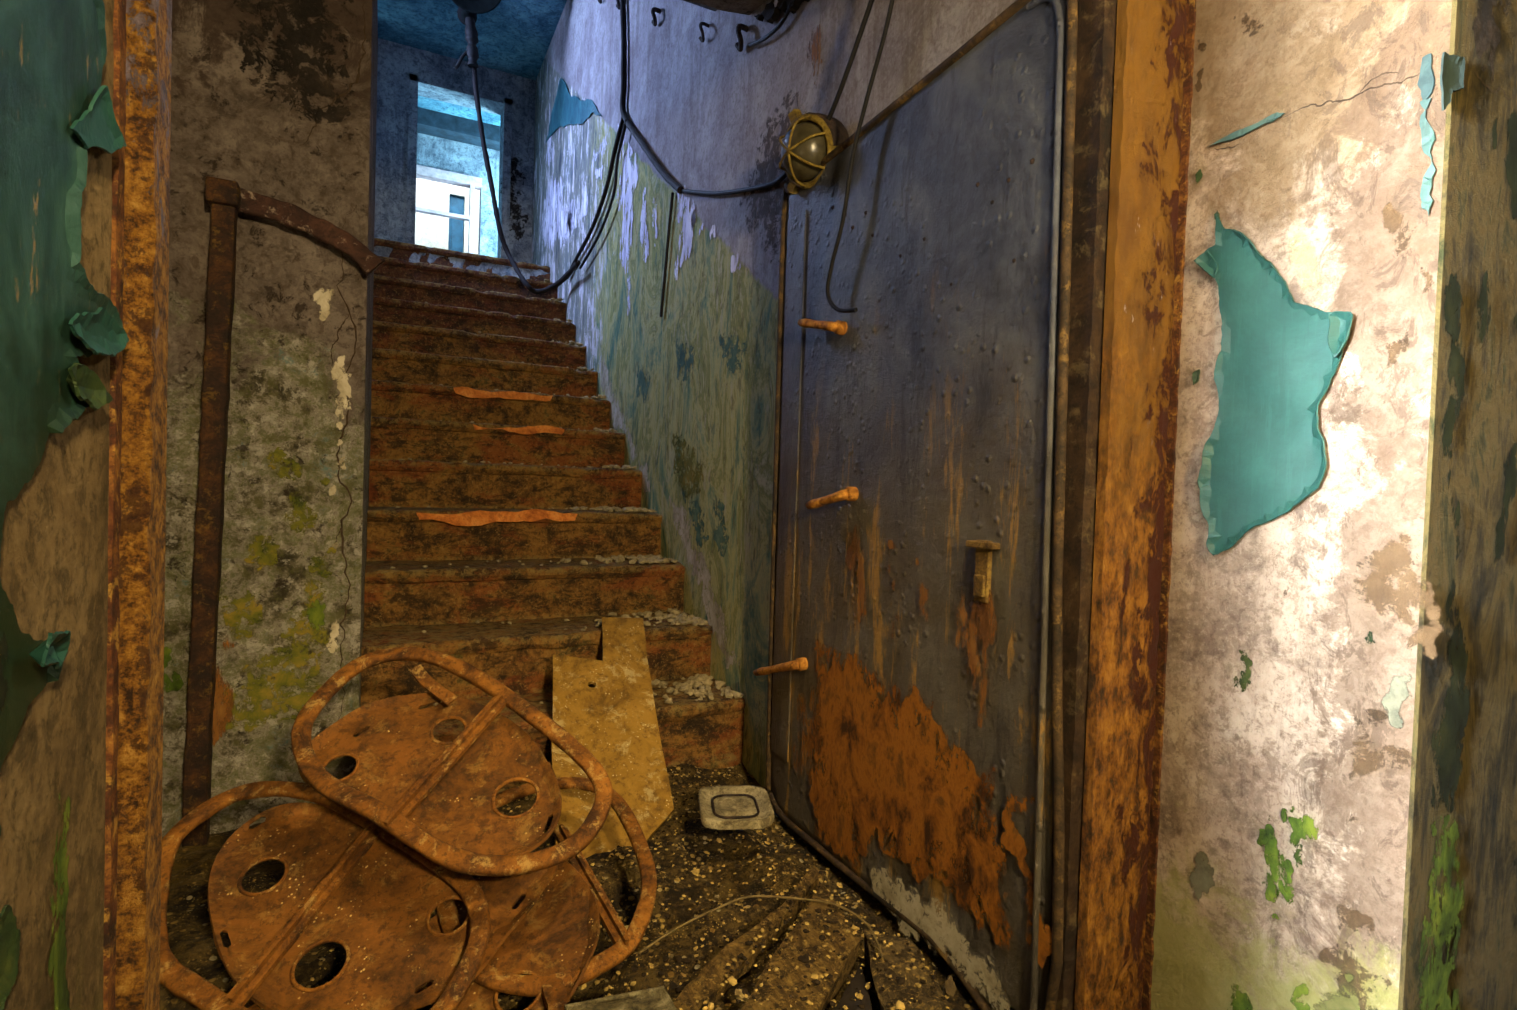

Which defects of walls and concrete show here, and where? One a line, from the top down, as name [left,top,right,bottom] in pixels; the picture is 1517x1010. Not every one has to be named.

flaking render [1417,52,1465,215]
peeling [0,0,129,770]
peeling [1192,211,1353,556]
leakage [1441,268,1491,560]
leakage [1494,442,1517,564]
corrosion [955,590,997,728]
flaking render [1354,532,1443,659]
leakage [1431,579,1471,813]
corrosion [793,640,1052,968]
leakage [1256,806,1319,920]
leakage [1290,972,1361,1010]
flaking render [1318,899,1392,1010]